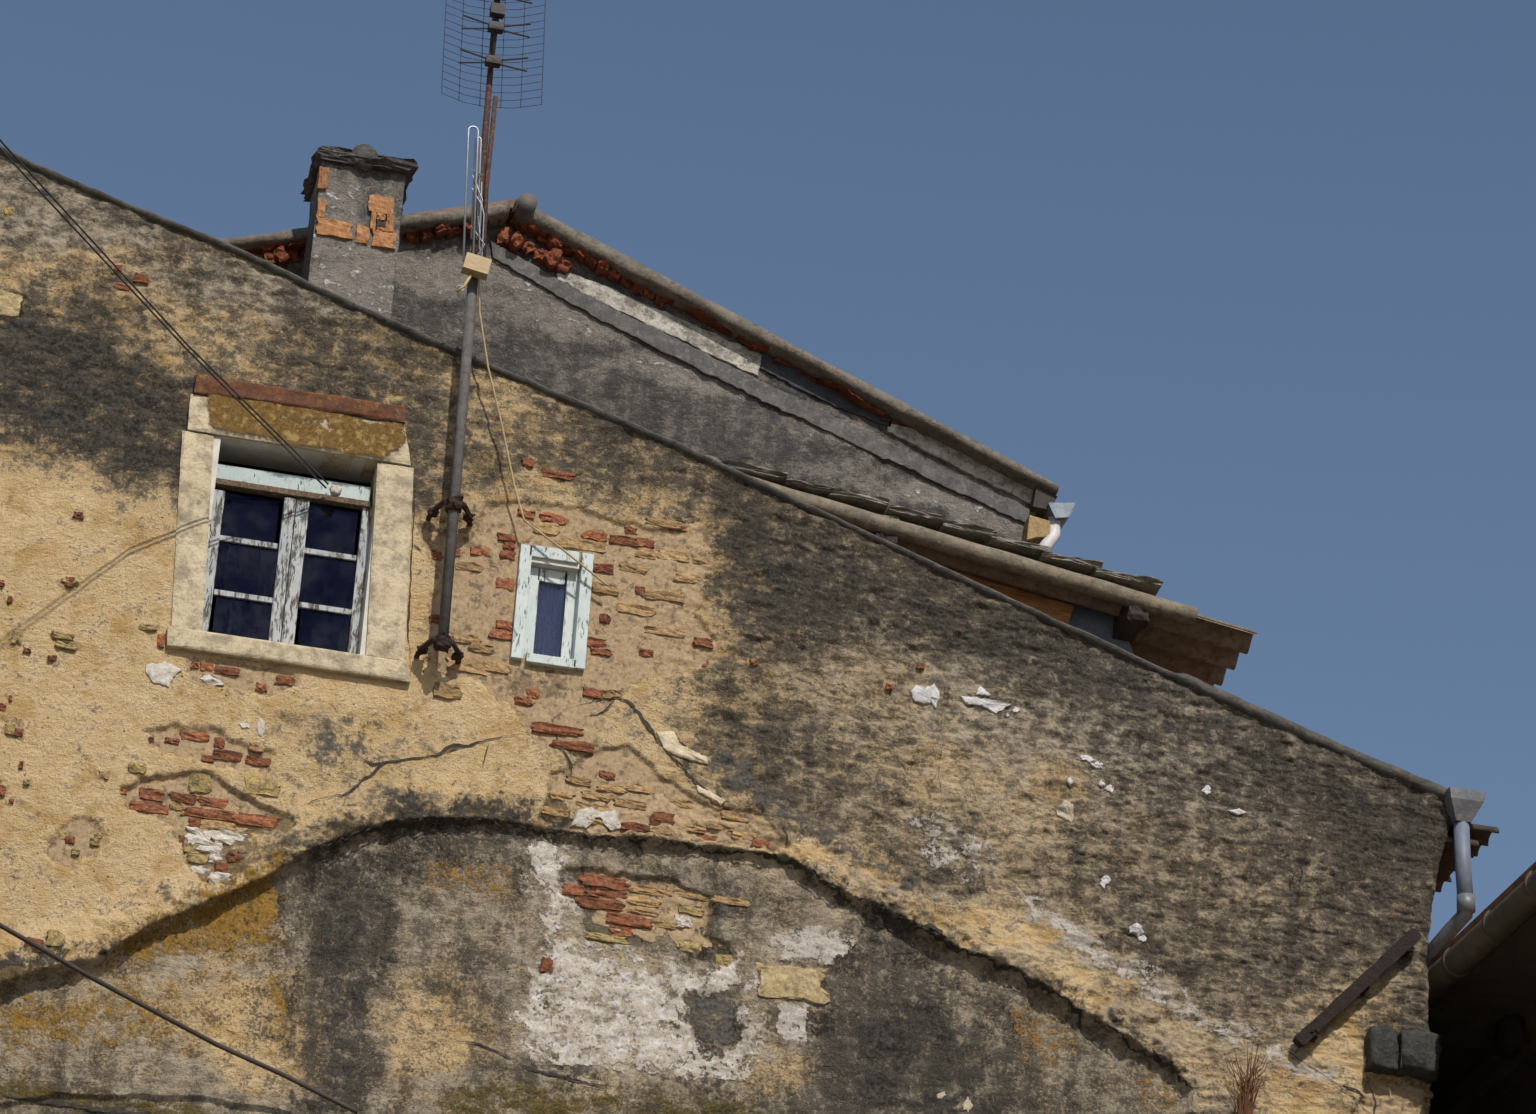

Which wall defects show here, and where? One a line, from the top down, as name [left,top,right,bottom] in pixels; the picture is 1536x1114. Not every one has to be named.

water stain [0,307,192,484]
flaking render [521,457,578,480]
flaking render [883,663,940,709]
flaking render [960,686,1020,718]
water stain [0,939,109,970]
flaking render [95,718,282,883]
water stain [287,854,399,1112]
flaking render [415,497,858,1084]
crack [301,689,1197,1114]
water stain [828,972,1012,1114]
water stain [898,809,1003,884]
water stain [1012,879,1338,1096]